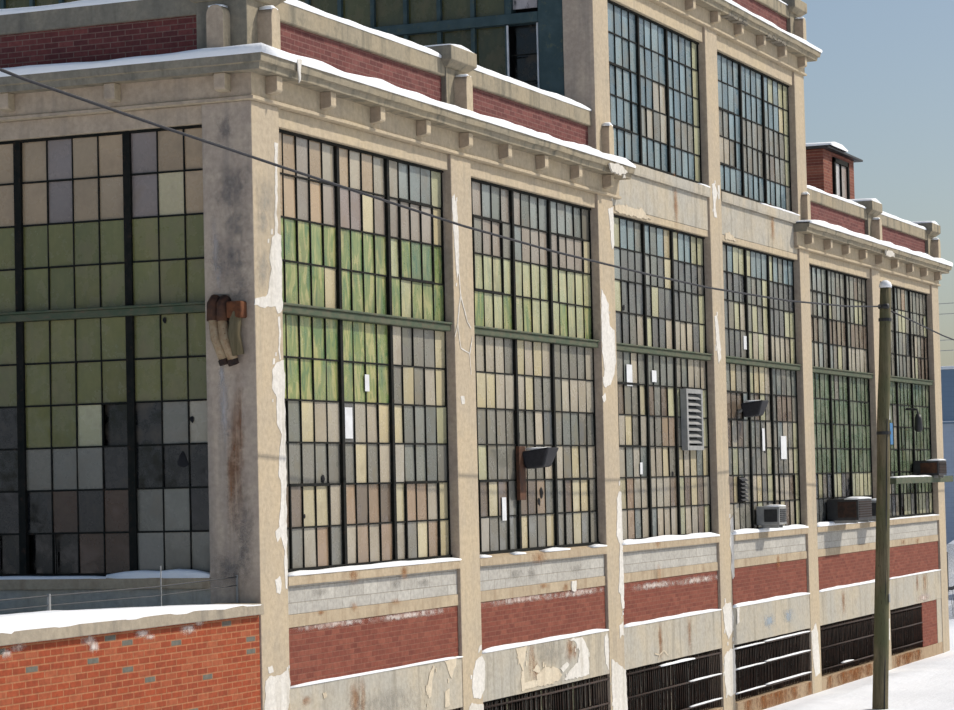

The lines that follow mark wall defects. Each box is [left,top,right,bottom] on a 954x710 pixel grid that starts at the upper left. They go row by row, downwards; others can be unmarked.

peeling [254,142,288,594]
peeling [601,289,616,402]
peeling [264,665,291,710]
peeling [469,645,485,710]
flaking render [516,637,590,691]
flaking render [722,598,740,698]
corrosion [828,664,871,687]